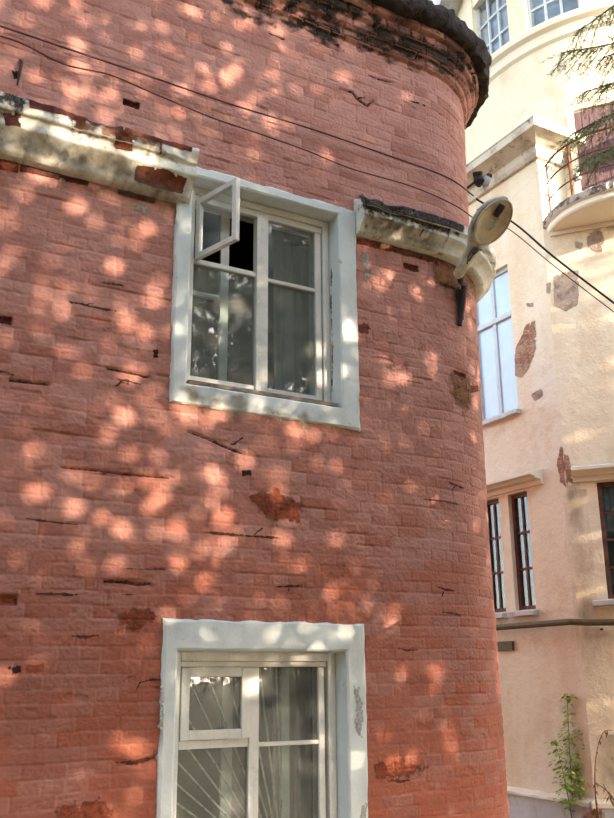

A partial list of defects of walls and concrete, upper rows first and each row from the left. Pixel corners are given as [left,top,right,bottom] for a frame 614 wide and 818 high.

spalling [3,110,23,127]
flaking render [29,98,192,152]
flaking render [0,159,89,186]
flaking render [118,165,187,213]
flaking render [514,321,537,377]
flaking render [557,447,573,487]
spalling [249,488,302,523]